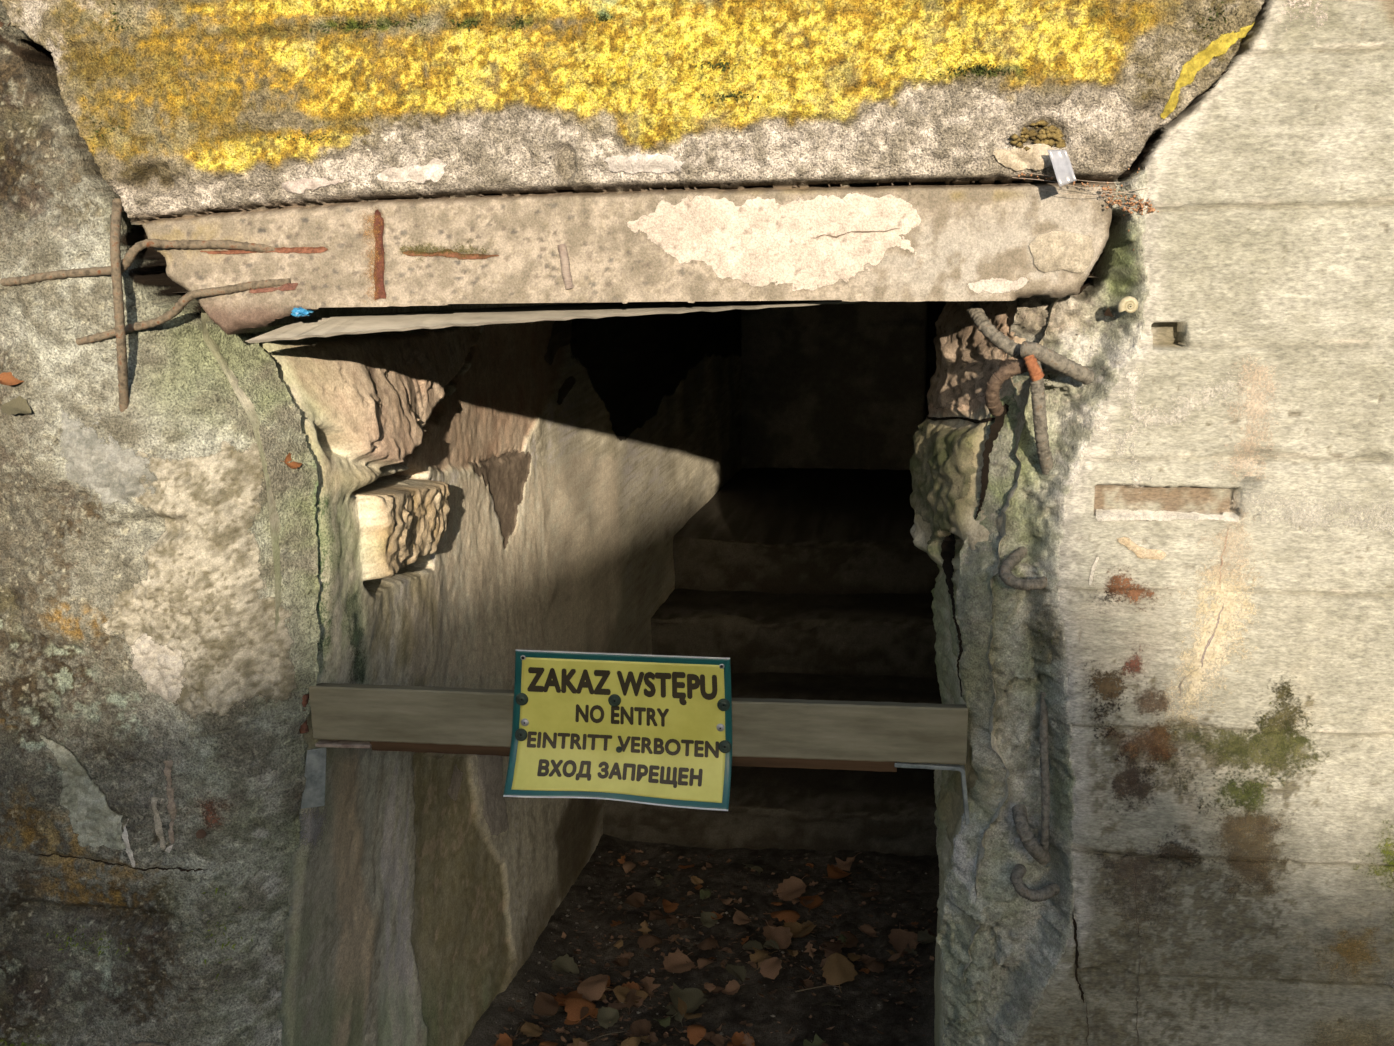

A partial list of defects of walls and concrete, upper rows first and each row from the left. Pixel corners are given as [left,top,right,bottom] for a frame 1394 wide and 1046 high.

corrosion [249,283,298,293]
corrosion [373,209,499,300]
peeling [627,181,921,291]
peeling [468,450,531,549]
crack [926,404,1009,697]
spalling [936,22,1255,1046]
water stain [1076,560,1329,934]
crack [30,853,208,872]
crack [1072,911,1089,1045]